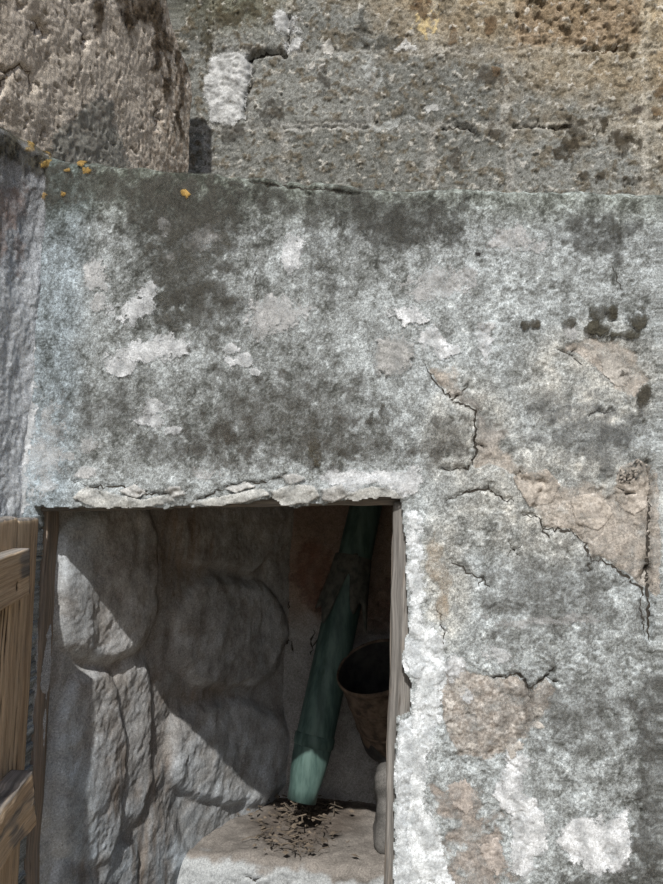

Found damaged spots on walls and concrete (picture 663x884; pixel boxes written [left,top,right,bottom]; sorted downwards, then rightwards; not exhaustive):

damp [83,173,308,377]
damp [387,267,460,360]
damp [133,398,182,435]
crack [73,473,287,506]
crack [425,364,652,642]
flaking render [430,368,661,595]
flaking render [438,669,556,759]
crack [493,668,556,699]
flaking render [430,778,518,884]